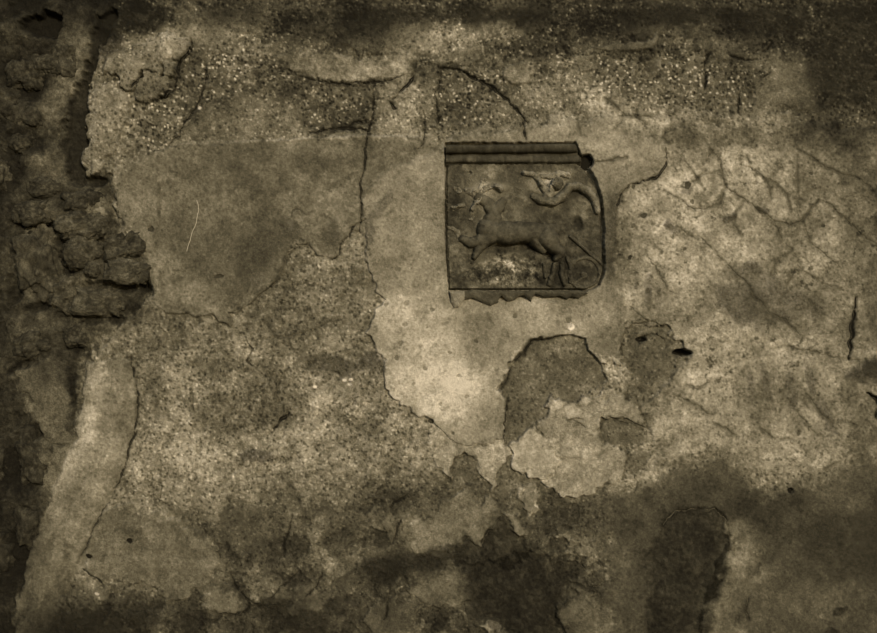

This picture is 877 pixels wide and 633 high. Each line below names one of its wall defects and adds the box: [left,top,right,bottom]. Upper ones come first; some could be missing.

crack [289,70,414,260]
crack [418,68,526,153]
crack [605,98,877,294]
crack [684,231,863,360]
peeling [385,384,442,418]
spalling [450,325,691,514]
crack [676,383,735,435]
peeling [206,587,243,613]
spalling [218,499,272,554]
spalling [468,515,581,633]
spalling [641,507,730,633]